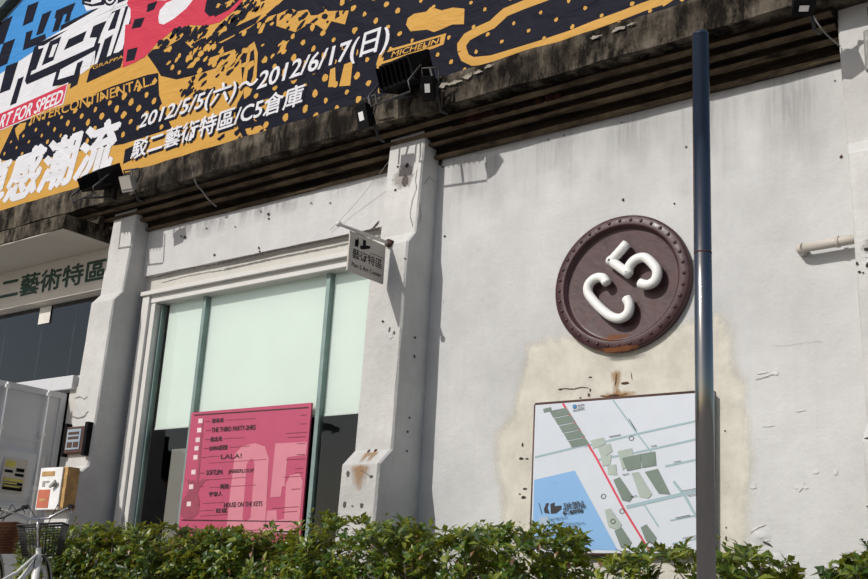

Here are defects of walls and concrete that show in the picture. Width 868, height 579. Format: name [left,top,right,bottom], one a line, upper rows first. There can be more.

peeling [439,64,493,88]
spalling [393,163,412,191]
rust [601,372,632,397]
rust [354,449,377,482]
peeling [496,322,696,579]
peeling [713,315,750,560]